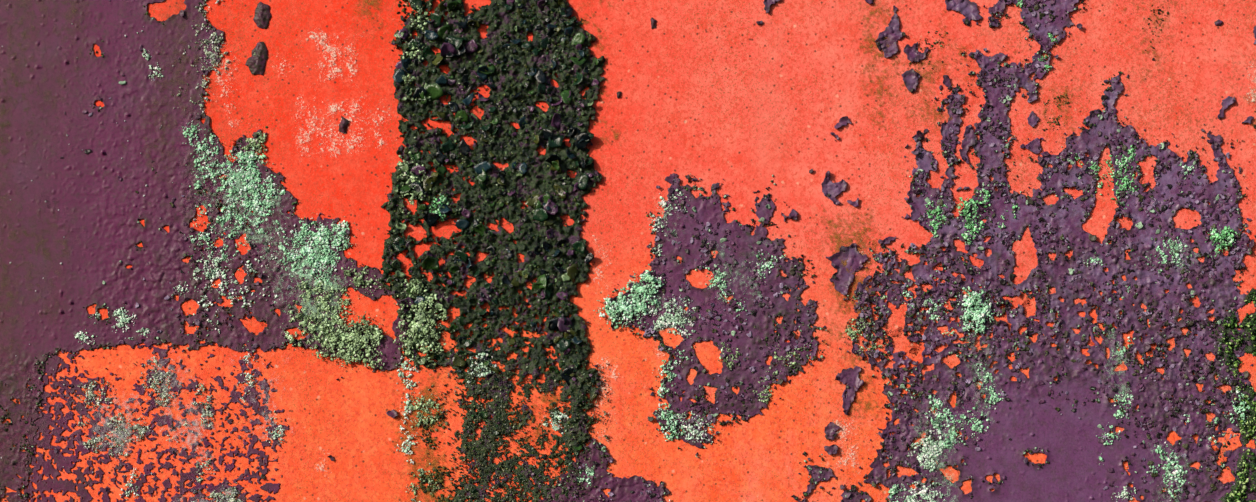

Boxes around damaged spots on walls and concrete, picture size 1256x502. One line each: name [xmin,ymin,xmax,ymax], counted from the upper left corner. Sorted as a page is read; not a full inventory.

peeling [0,0,602,502]
peeling [604,0,1256,502]